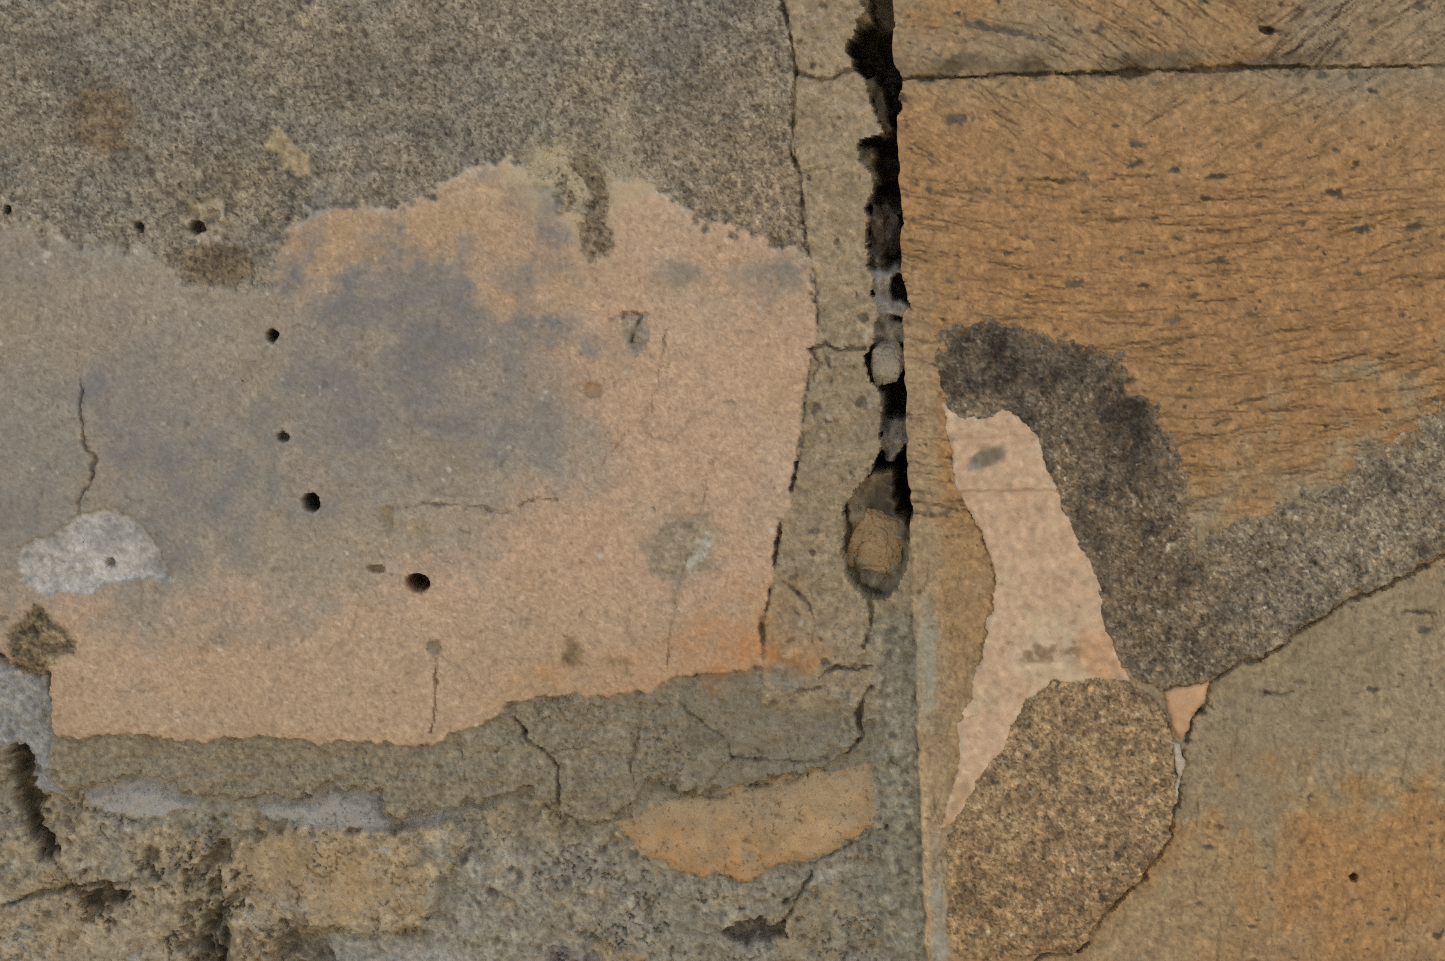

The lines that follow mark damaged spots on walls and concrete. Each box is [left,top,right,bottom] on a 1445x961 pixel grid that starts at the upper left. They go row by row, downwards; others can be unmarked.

crack [778,0,856,272]
crack [72,199,87,371]
spalling [174,195,261,292]
spalling [553,154,616,263]
crack [587,326,669,477]
crack [393,495,559,515]
peeling [934,315,1445,961]
spalling [0,541,204,860]
spalling [253,781,505,834]
hole [79,883,130,913]
hole [191,910,232,961]
spalling [274,849,504,961]